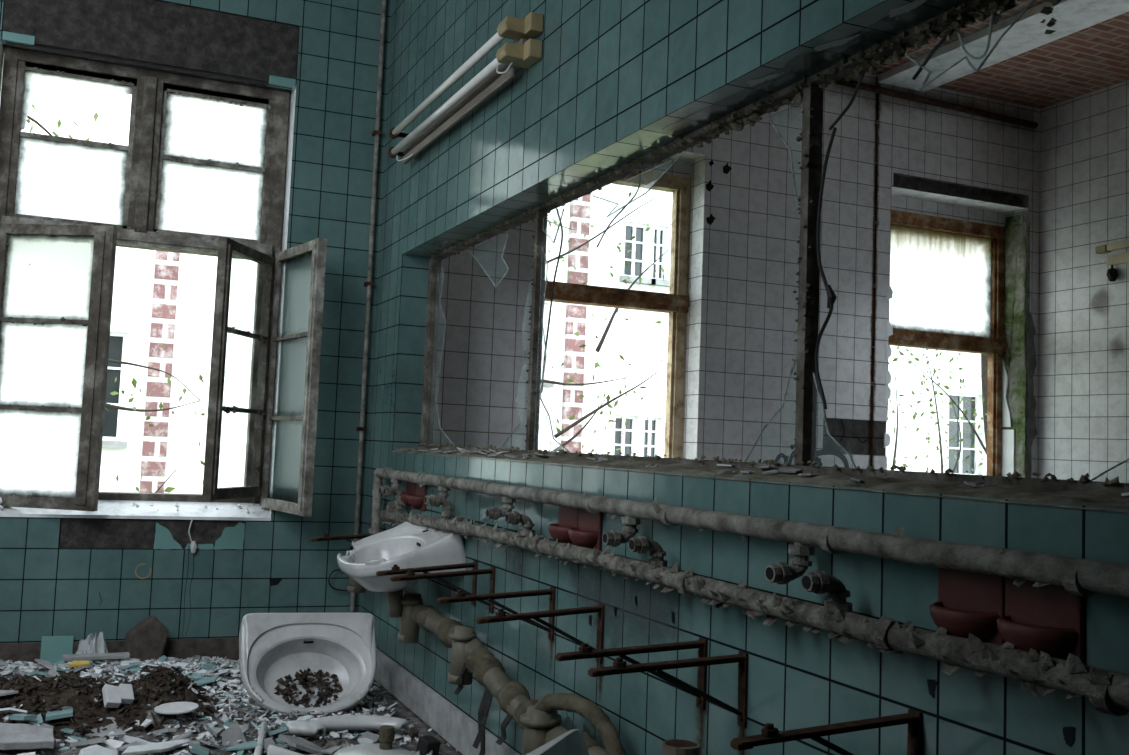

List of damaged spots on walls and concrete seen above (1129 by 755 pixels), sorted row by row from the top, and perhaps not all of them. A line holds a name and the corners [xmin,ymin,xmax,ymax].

spalling [1040,0,1062,34]
spalling [2,0,298,81]
peeling [60,518,245,550]